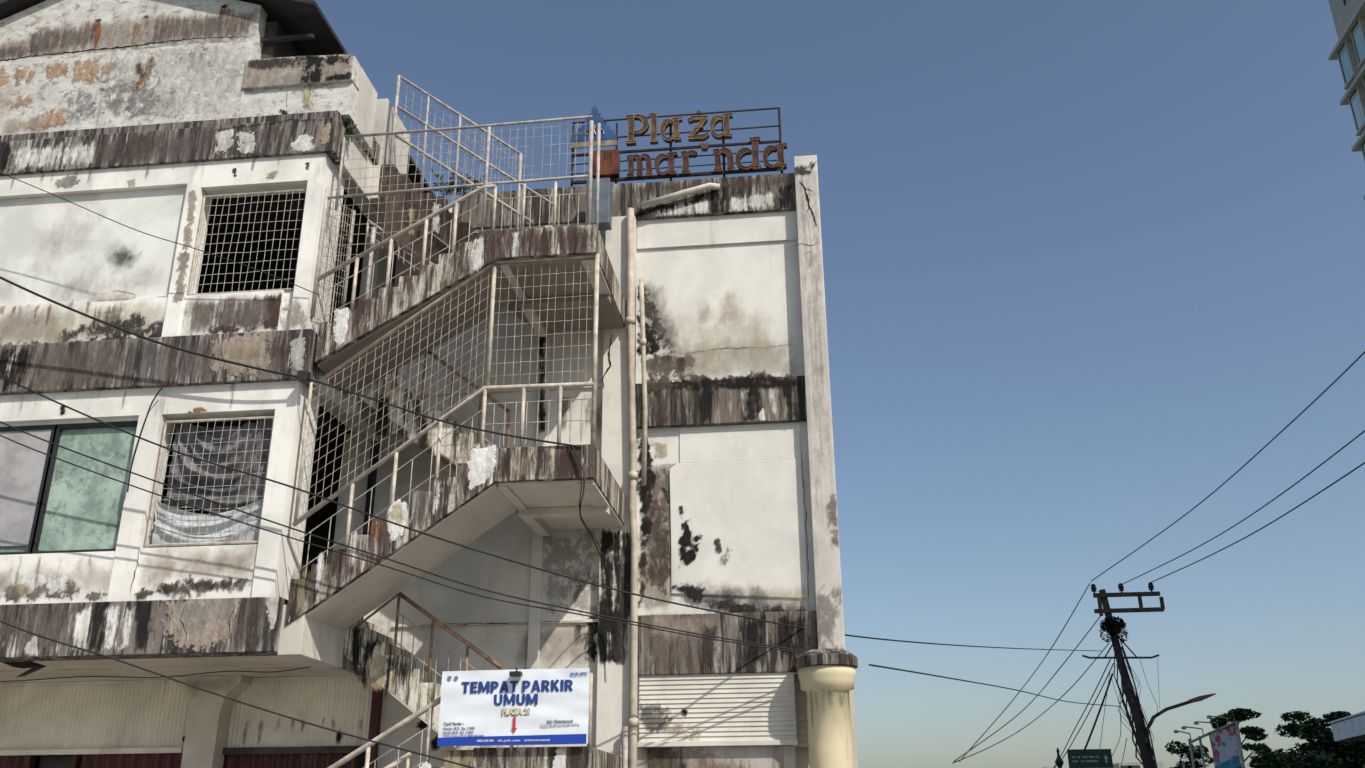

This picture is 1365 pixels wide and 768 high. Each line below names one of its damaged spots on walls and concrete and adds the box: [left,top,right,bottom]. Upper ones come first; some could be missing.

corrosion [92,23,101,49]
peeling [0,38,246,170]
spalling [215,129,256,154]
damp [0,294,308,392]
damp [538,337,584,476]
peeling [386,491,418,542]
peeling [467,445,497,490]
damp [575,287,806,672]
damp [1,558,110,657]
damp [135,531,357,652]
damp [342,627,408,698]
damp [640,704,742,768]